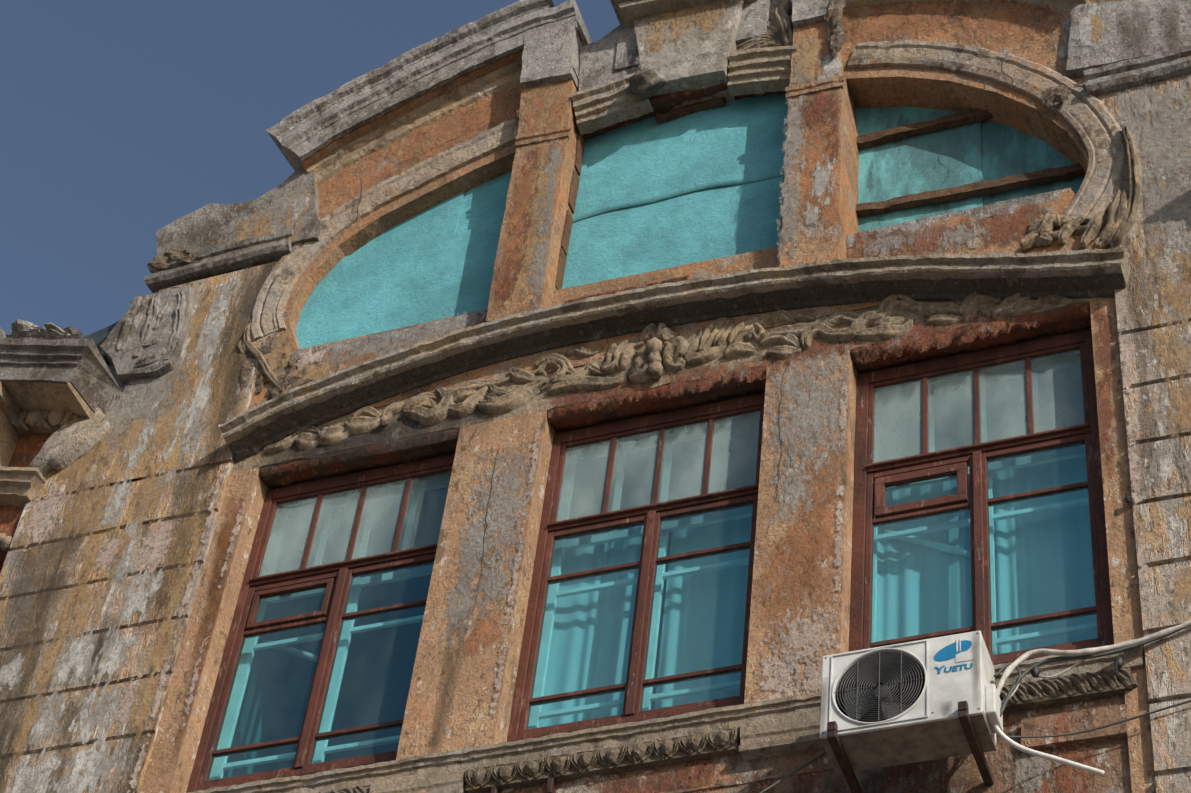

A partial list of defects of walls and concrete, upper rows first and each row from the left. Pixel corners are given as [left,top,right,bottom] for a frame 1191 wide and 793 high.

peeling [1140,141,1191,371]
peeling [0,277,346,793]
crack [472,451,499,616]
peeling [1094,306,1191,610]